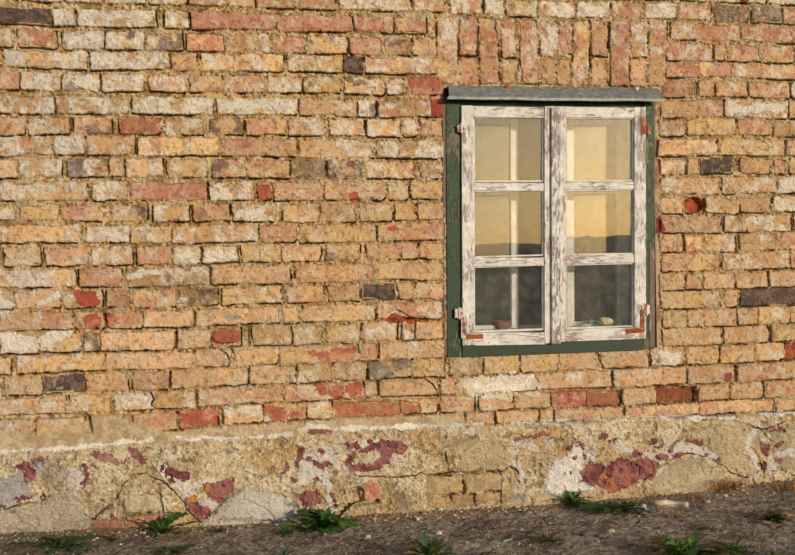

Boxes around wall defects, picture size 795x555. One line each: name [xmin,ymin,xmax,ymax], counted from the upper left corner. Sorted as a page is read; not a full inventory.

peeling [0,456,49,510]
peeling [66,447,148,495]
crack [92,472,242,526]
peeling [157,460,236,521]
peeling [281,438,408,513]
peeling [544,432,721,495]